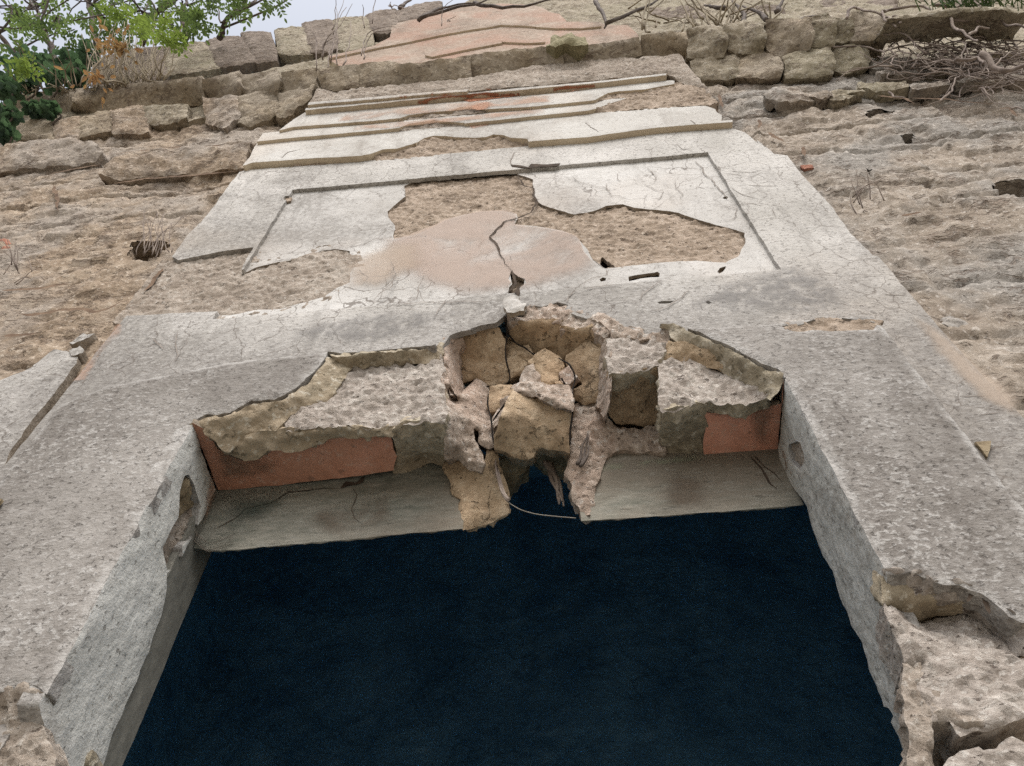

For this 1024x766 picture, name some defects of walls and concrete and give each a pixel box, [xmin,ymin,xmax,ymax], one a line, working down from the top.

spalling [388,174,745,279]
crack [678,145,761,221]
crack [359,153,620,446]
flaking render [784,317,884,332]
spalling [190,303,783,532]
spalling [163,477,194,565]
spalling [870,567,1024,766]